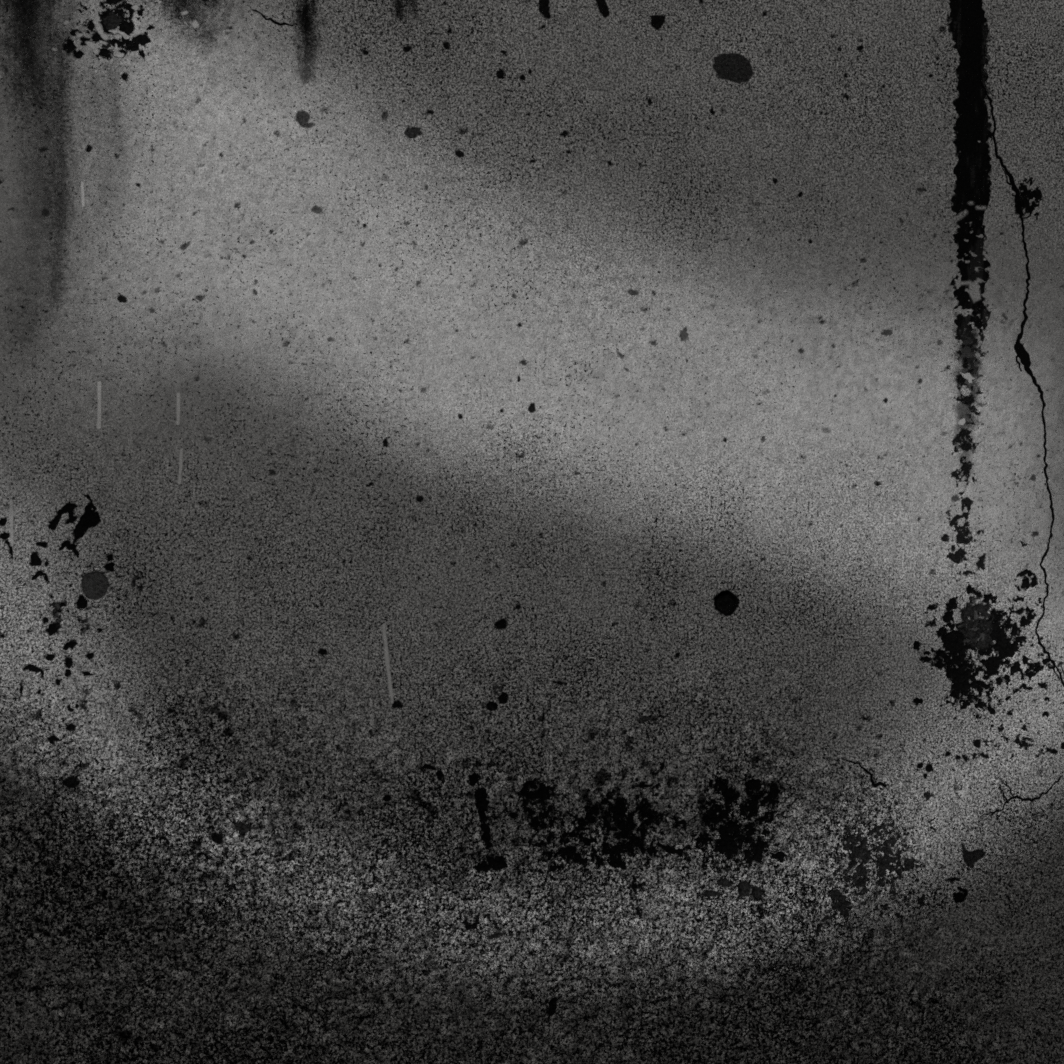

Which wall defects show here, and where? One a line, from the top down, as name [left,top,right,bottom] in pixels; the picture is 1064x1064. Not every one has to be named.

damp [2,0,50,92]
spalling [53,0,154,64]
damp [164,0,216,39]
damp [298,0,316,79]
damp [941,0,992,576]
crack [979,67,1064,686]
spalling [0,518,13,559]
spalling [29,494,101,583]
spalling [19,595,94,695]
spalling [913,569,1064,762]
spalling [469,762,787,918]
crack [981,775,1063,816]